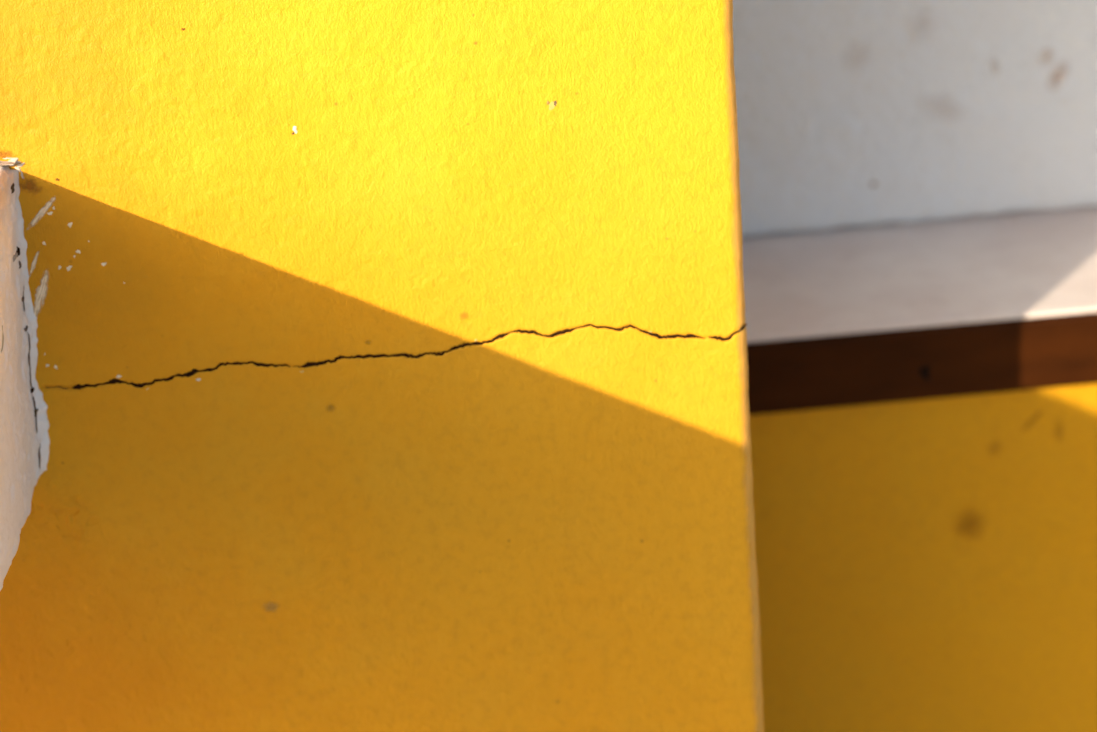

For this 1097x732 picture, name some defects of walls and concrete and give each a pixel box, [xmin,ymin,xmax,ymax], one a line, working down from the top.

crack [13,247,747,469]